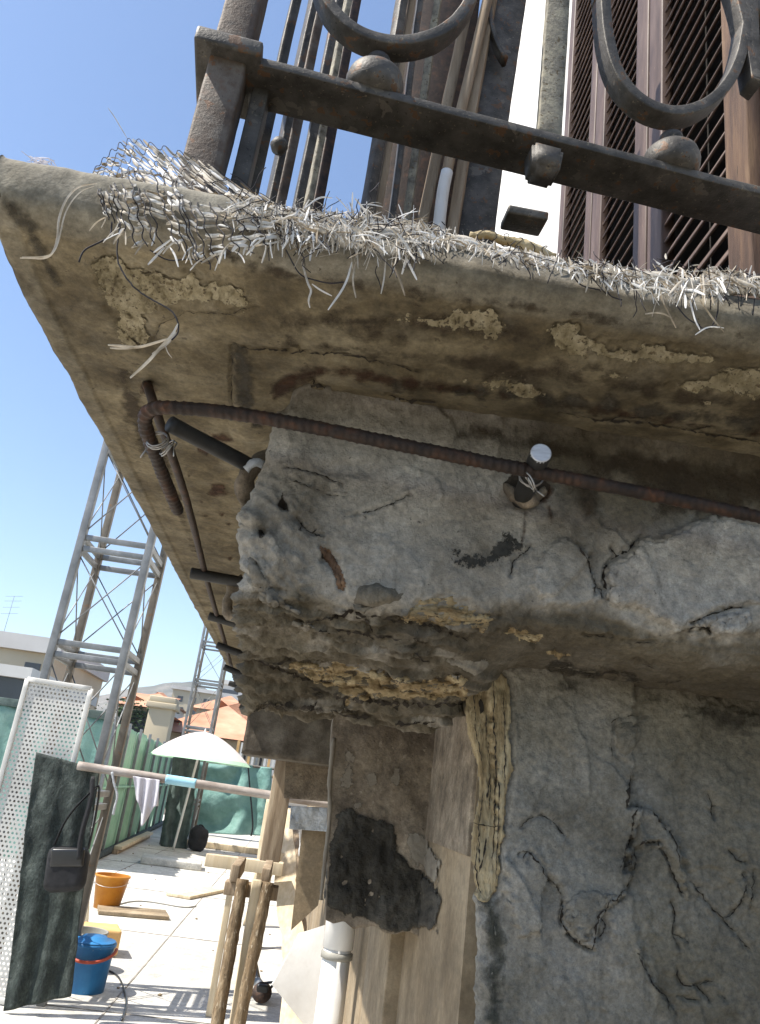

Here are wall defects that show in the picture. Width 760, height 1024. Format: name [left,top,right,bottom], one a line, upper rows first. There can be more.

damp [4,203,59,285]
spalling [91,256,248,346]
rust [273,367,460,399]
damp [450,358,582,401]
damp [535,380,756,431]
spalling [546,322,760,405]
flaking render [137,379,760,676]
mould [451,531,523,569]
crack [577,538,639,597]
crack [689,607,743,635]
flaking render [281,661,514,902]
crack [520,715,755,950]